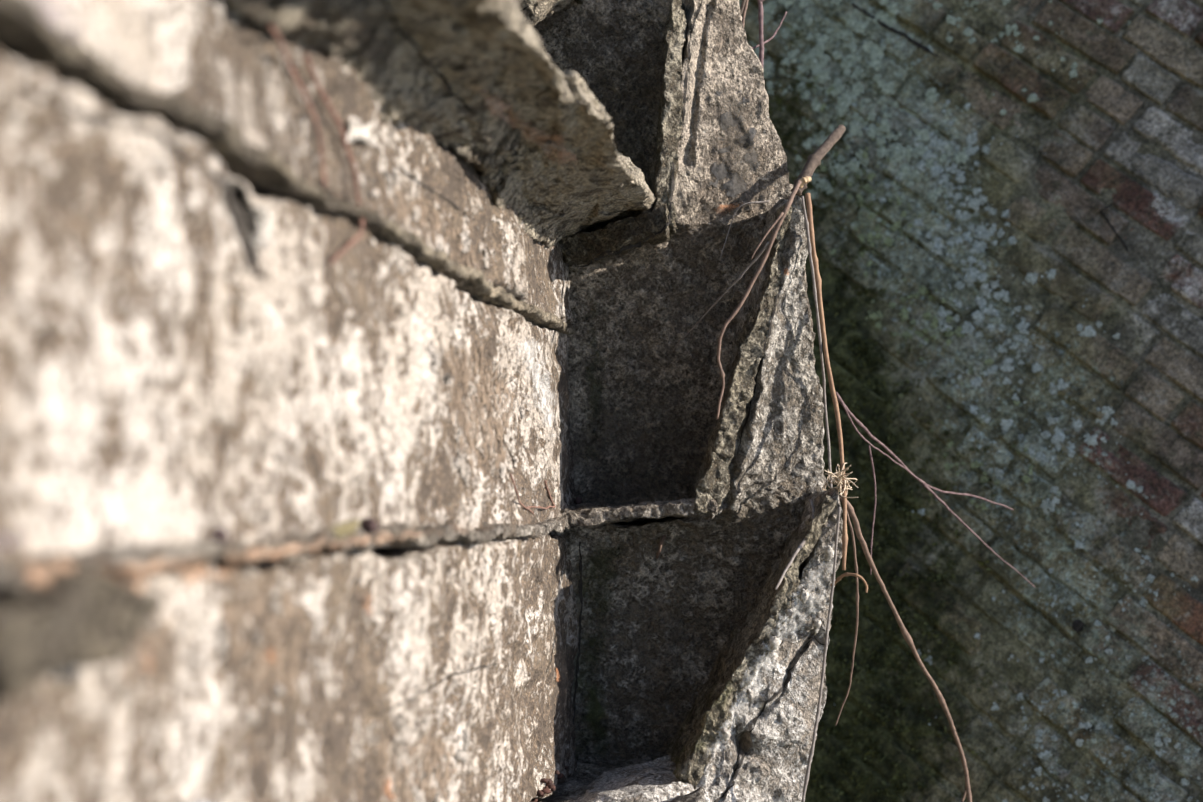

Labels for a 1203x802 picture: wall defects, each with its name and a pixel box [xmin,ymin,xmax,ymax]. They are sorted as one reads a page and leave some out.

crack [715,633,825,802]